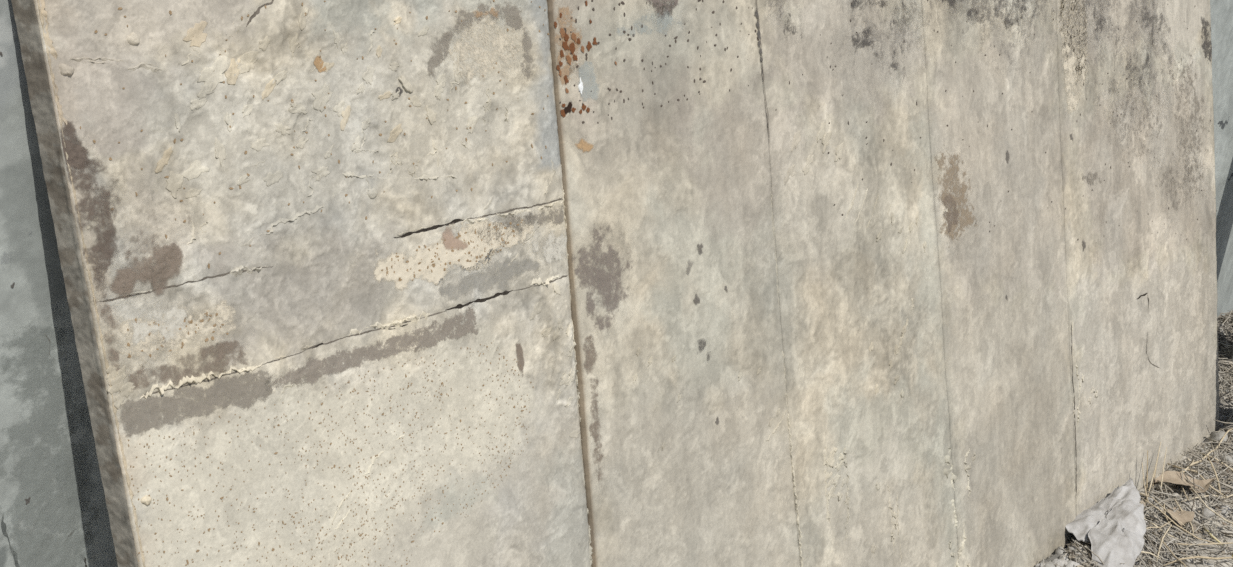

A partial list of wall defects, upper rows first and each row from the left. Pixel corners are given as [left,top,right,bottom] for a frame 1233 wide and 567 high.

rust [531,0,748,123]
leakage [942,0,1027,28]
leakage [1060,0,1106,113]
rust [381,220,523,281]
crack [394,198,564,238]
leakage [374,209,629,329]
leakage [936,153,975,239]
rust [101,307,229,370]
leakage [119,301,478,437]
crack [140,273,570,399]